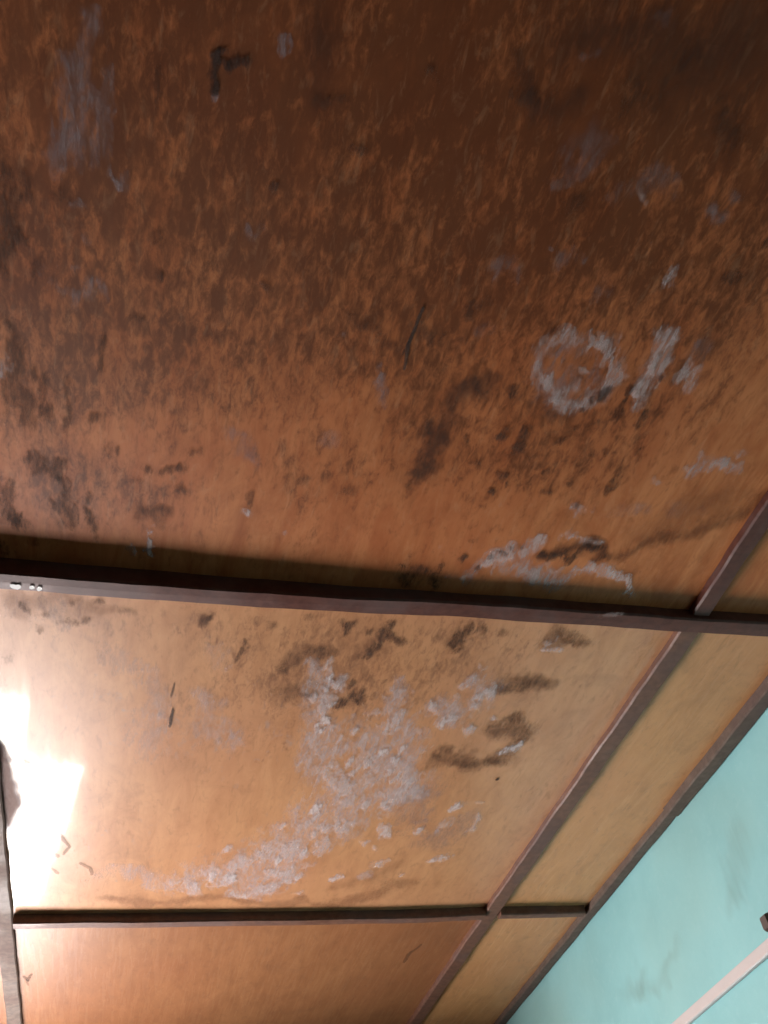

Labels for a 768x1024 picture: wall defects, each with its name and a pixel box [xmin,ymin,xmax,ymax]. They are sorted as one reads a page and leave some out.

water stain [475,535,632,590]
water stain [209,660,420,899]